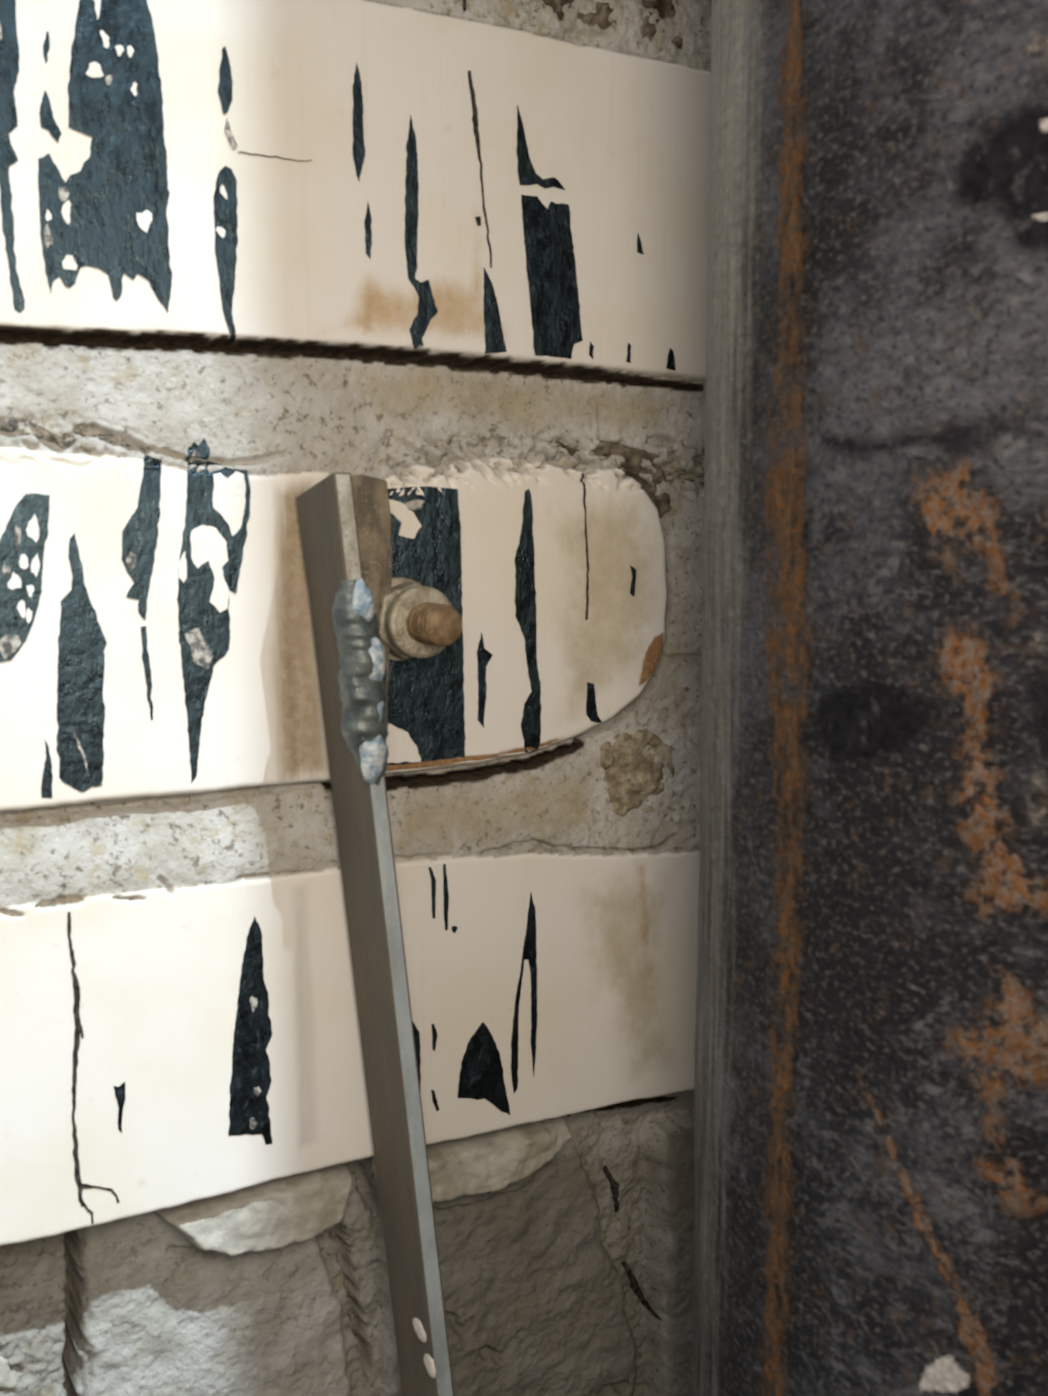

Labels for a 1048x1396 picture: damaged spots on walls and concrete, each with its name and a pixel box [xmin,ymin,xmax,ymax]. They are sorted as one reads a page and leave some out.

peeling [38,0,172,312]
peeling [516,105,594,359]
peeling [41,533,107,798]
peeling [0,418,162,720]
peeling [177,438,251,783]
corrosion [764,0,808,1396]
corrosion [913,461,1020,616]
corrosion [938,631,1048,919]
crack [67,912,120,1224]
peeling [228,916,272,1144]
corrosion [860,1073,999,1396]
corrosion [947,972,1048,1214]